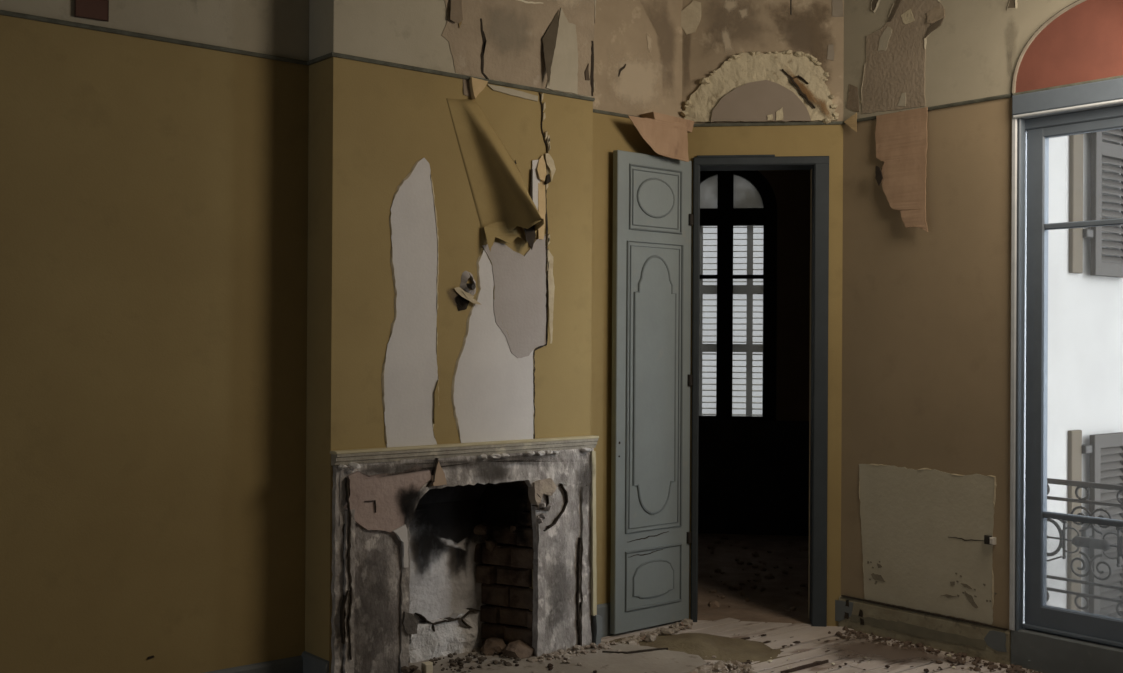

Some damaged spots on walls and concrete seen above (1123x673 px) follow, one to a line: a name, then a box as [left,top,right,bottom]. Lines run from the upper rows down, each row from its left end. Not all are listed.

spalling [681,50,839,124]
spalling [454,271,482,311]
spalling [478,450,559,459]
spalling [338,461,447,673]
spalling [528,478,557,657]
peeling [844,464,997,625]